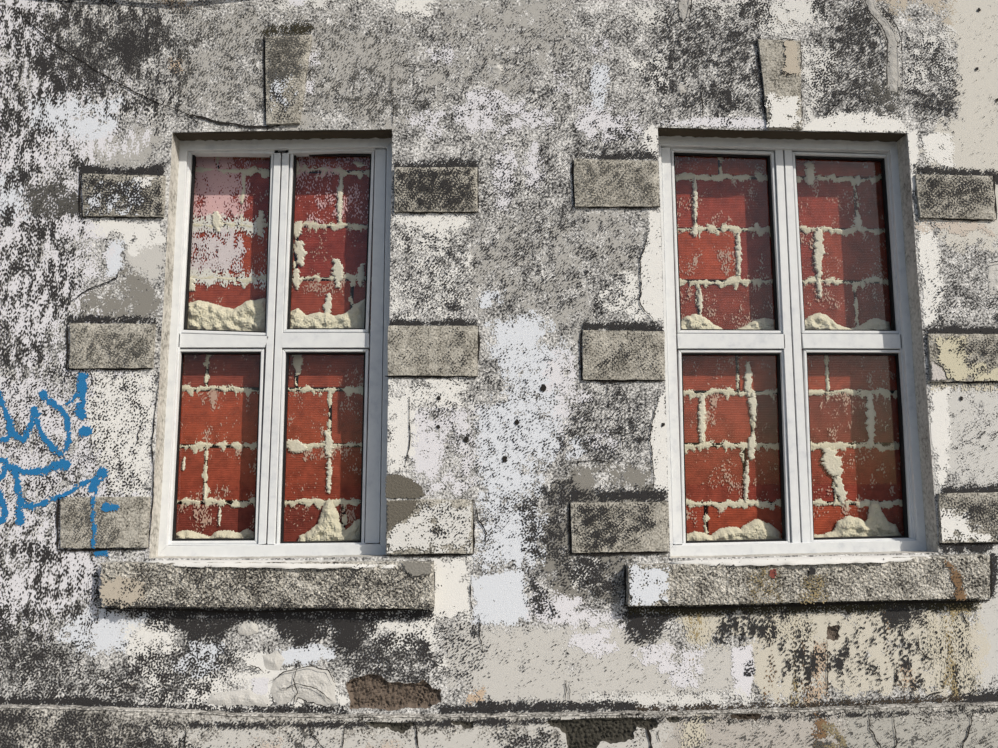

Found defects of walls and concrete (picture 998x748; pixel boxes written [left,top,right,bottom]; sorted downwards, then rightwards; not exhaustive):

flaking render [574,0,998,327]
flaking render [173,140,998,748]
crack [869,712,897,748]